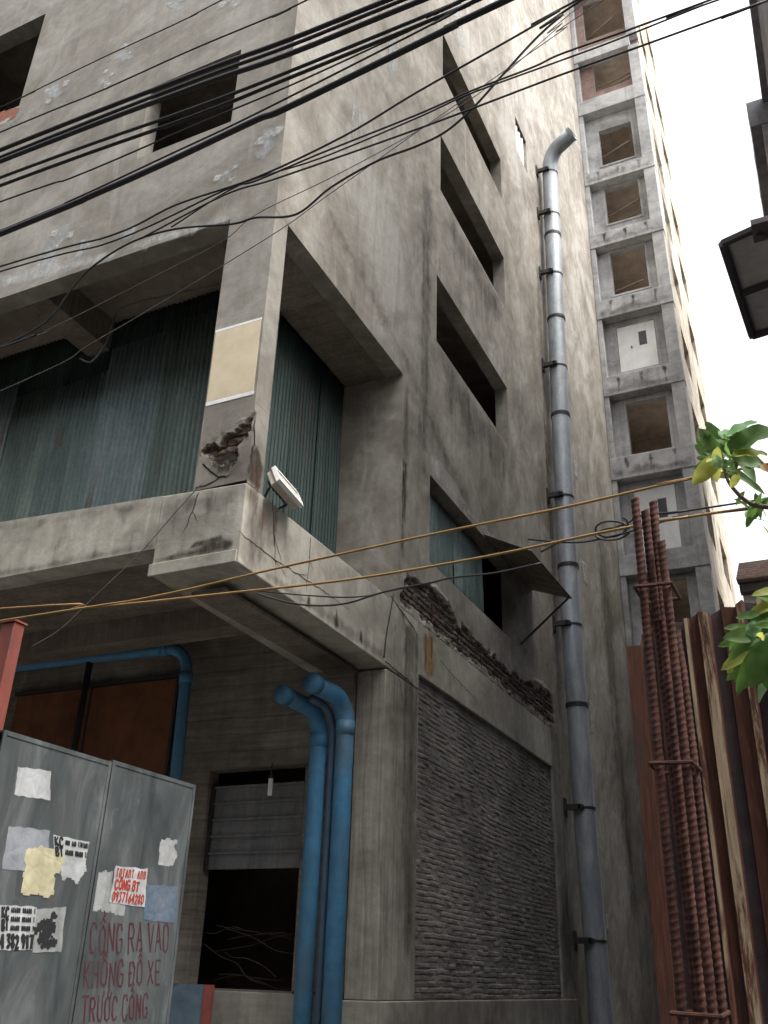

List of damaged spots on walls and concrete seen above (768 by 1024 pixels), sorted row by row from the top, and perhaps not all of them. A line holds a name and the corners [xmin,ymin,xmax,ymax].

spalling [194,401,256,490]
damp [166,536,232,559]
crack [239,499,354,614]
spalling [398,543,559,734]